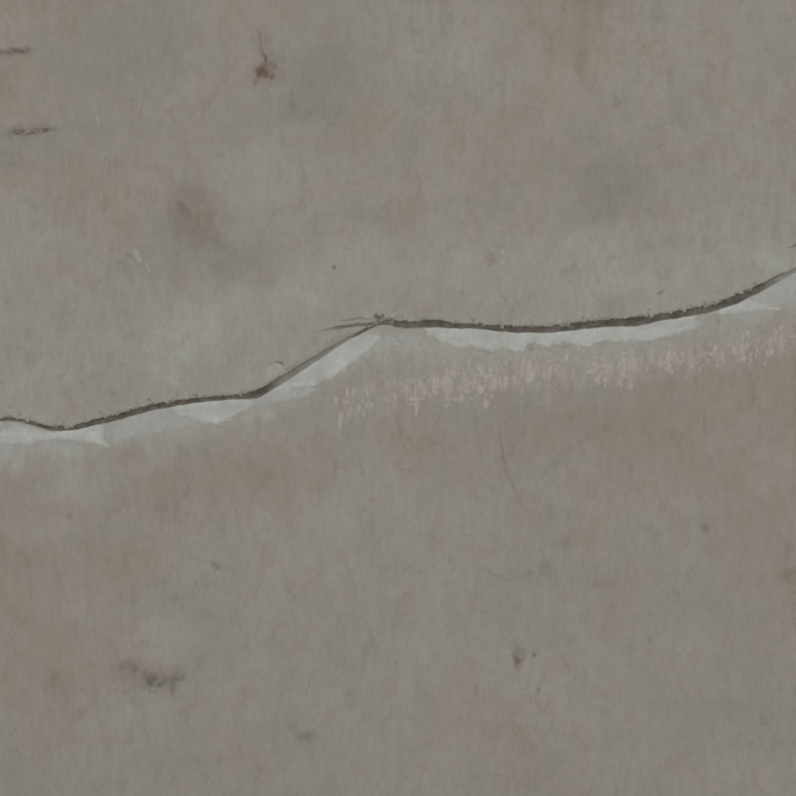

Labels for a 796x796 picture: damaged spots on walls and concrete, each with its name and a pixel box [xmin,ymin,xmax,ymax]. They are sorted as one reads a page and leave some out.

crack [0,267,796,432]